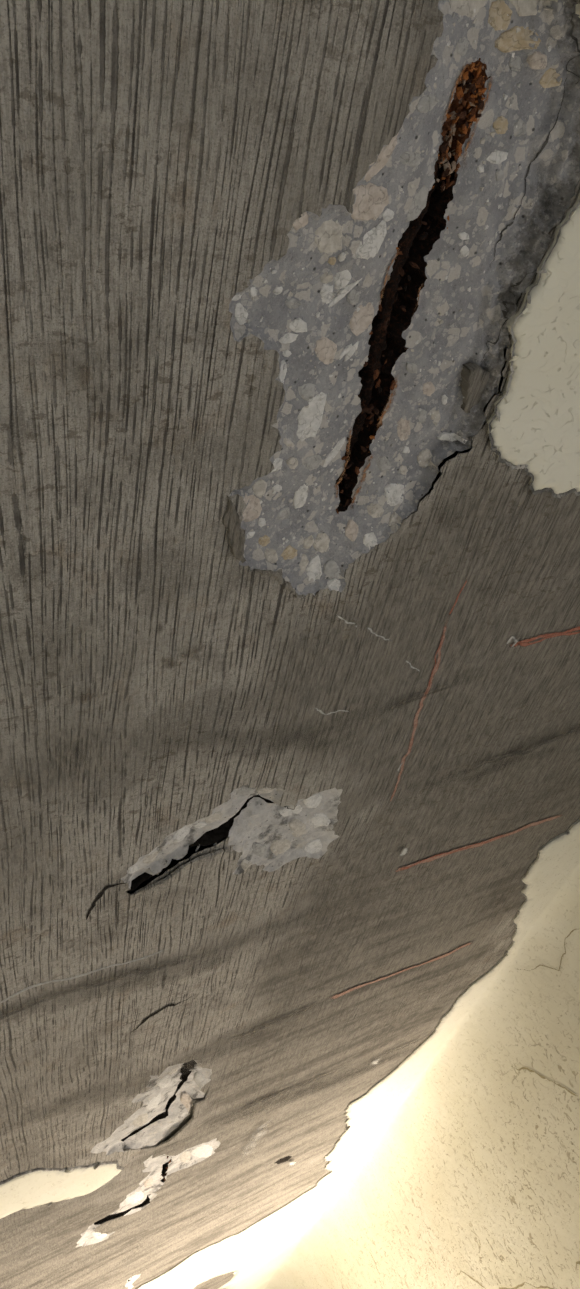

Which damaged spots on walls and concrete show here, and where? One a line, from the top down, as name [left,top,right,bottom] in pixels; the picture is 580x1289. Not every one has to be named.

spalling [222,0,580,599]
corrosion [390,580,467,801]
spalling [121,784,342,889]
corrosion [395,815,562,872]
spalling [0,1060,220,1248]